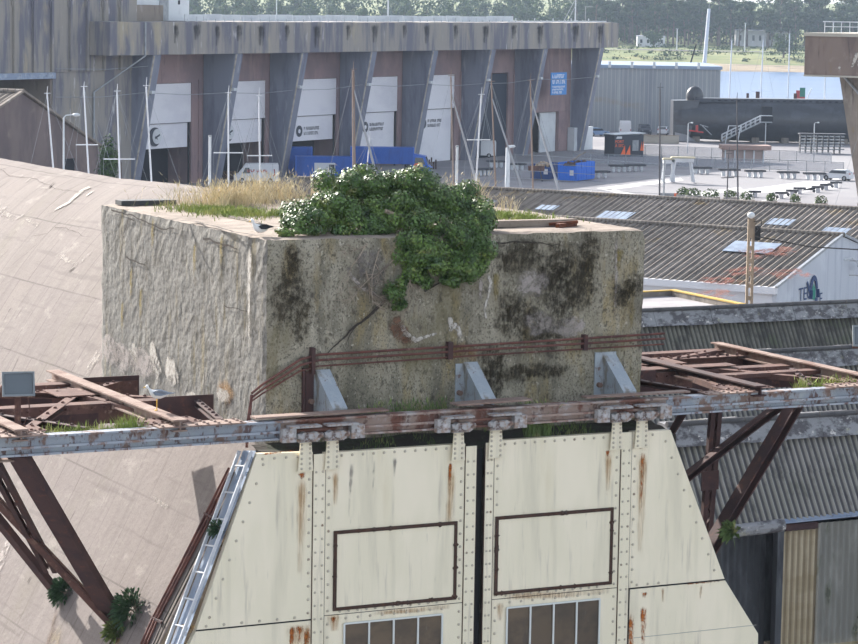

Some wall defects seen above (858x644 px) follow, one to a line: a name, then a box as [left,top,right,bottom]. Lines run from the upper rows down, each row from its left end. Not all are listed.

water stain [520,272,546,294]
water stain [479,274,499,318]
efflorescence [448,317,462,338]
water stain [526,312,585,337]
corrosion [290,627,310,644]
corrosion [629,608,646,644]